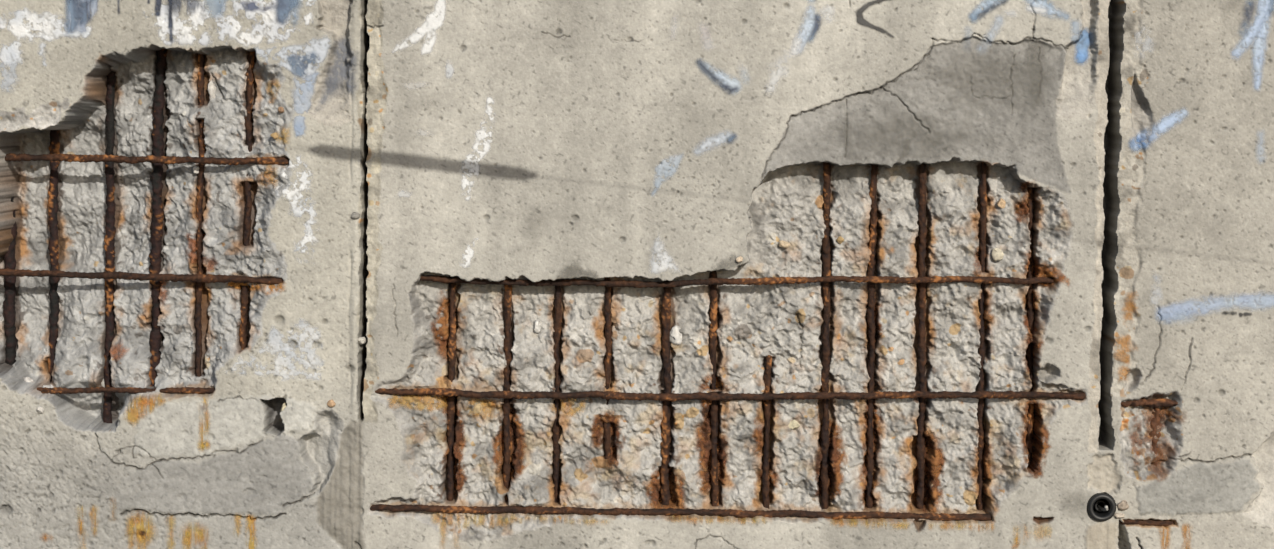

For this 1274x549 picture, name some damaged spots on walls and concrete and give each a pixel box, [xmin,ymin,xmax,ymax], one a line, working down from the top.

spalling [0,43,295,435]
spalling [298,0,1110,544]
rust [1024,253,1068,371]
spalling [1111,0,1186,483]
rust [391,395,496,492]
rust [493,408,526,480]
rust [592,413,621,466]
rust [697,377,728,491]
rust [815,420,845,500]
rust [860,399,881,506]
rust [914,431,979,528]
rust [1023,400,1050,476]